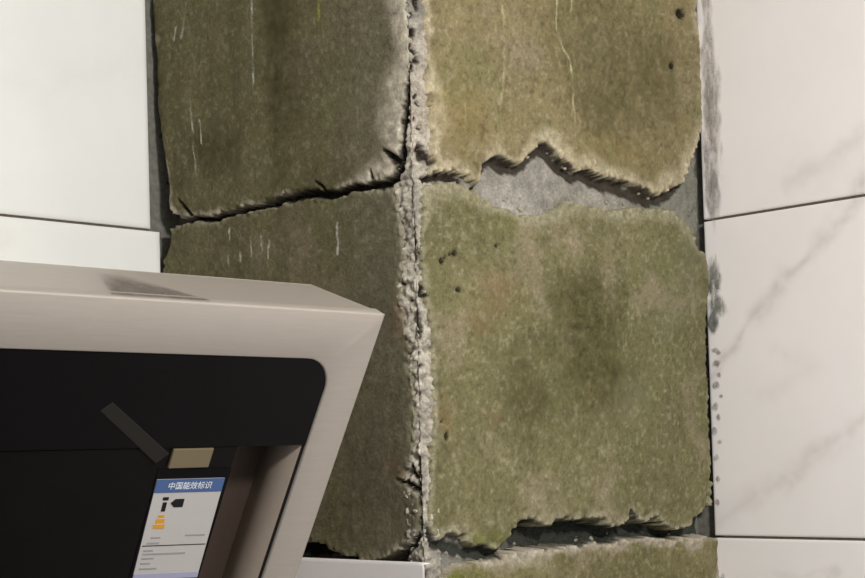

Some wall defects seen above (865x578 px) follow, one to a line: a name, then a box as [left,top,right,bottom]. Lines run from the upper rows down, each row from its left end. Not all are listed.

crack [172,70,681,224]
spalling [414,144,698,246]
crack [417,284,427,338]
crack [304,542,359,558]
crack [401,457,671,560]